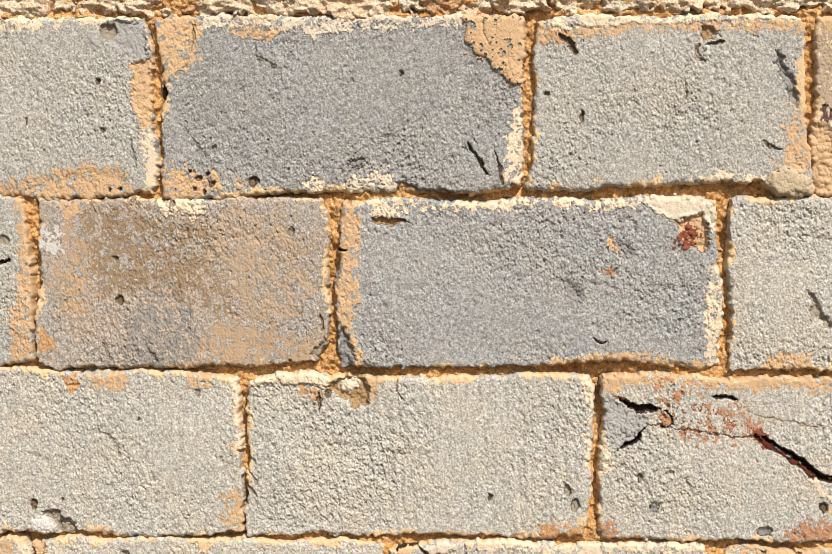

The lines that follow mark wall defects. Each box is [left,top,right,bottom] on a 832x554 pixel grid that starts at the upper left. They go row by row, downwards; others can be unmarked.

rust [820,104,832,123]
rust [671,222,702,250]
crack [619,395,832,482]